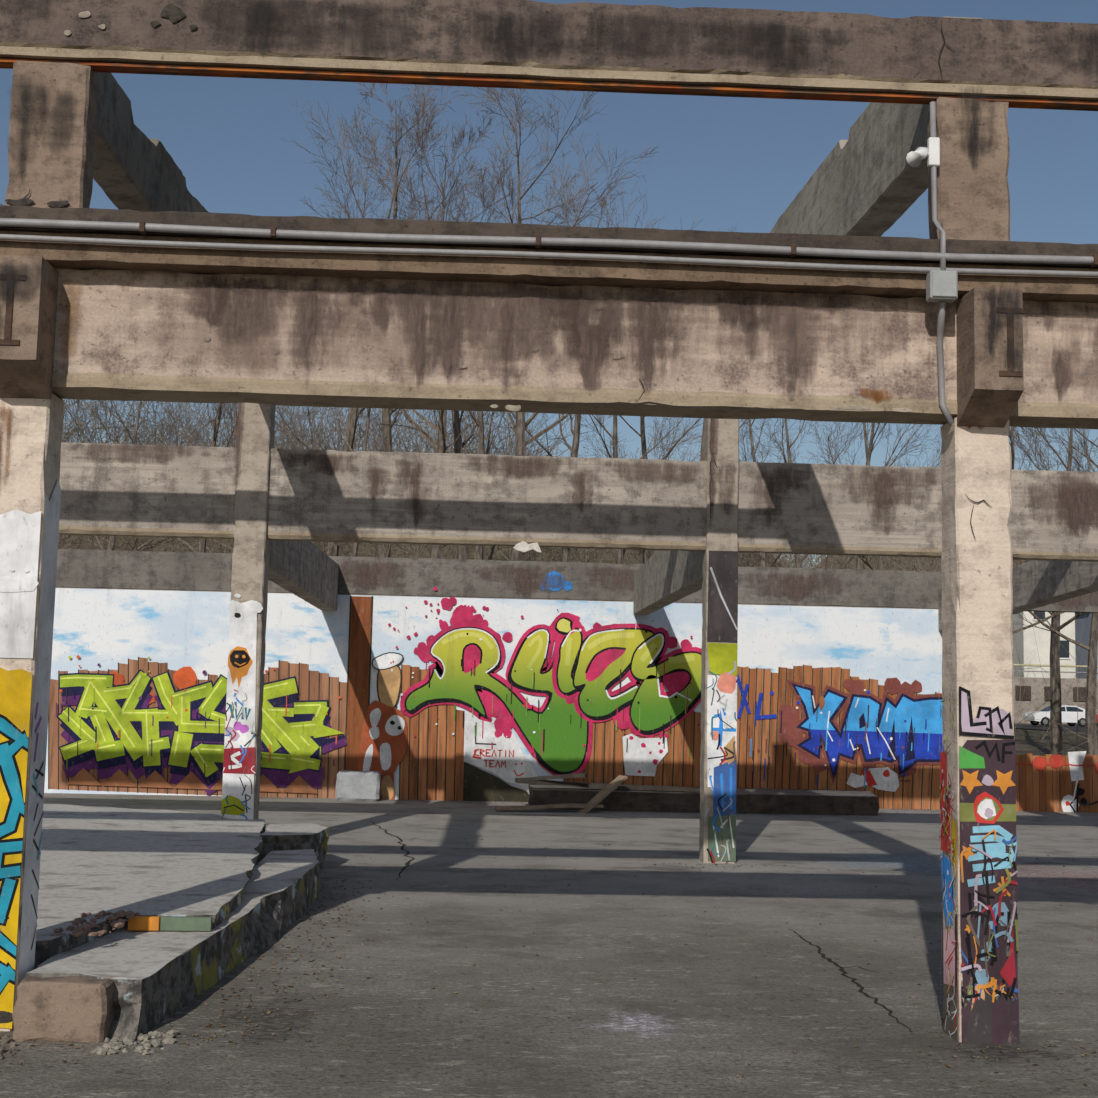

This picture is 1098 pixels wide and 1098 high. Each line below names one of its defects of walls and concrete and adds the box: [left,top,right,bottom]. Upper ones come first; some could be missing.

leakage [188,278,285,341]
leakage [293,284,340,368]
leakage [349,282,683,388]
leakage [718,294,813,389]
corrosion [0,408,11,471]
leakage [371,468,386,497]
leakage [399,460,426,524]
leakage [474,455,560,478]
leakage [571,471,592,510]
leakage [606,462,695,482]
crack [966,495,991,538]
leakage [1047,475,1098,534]